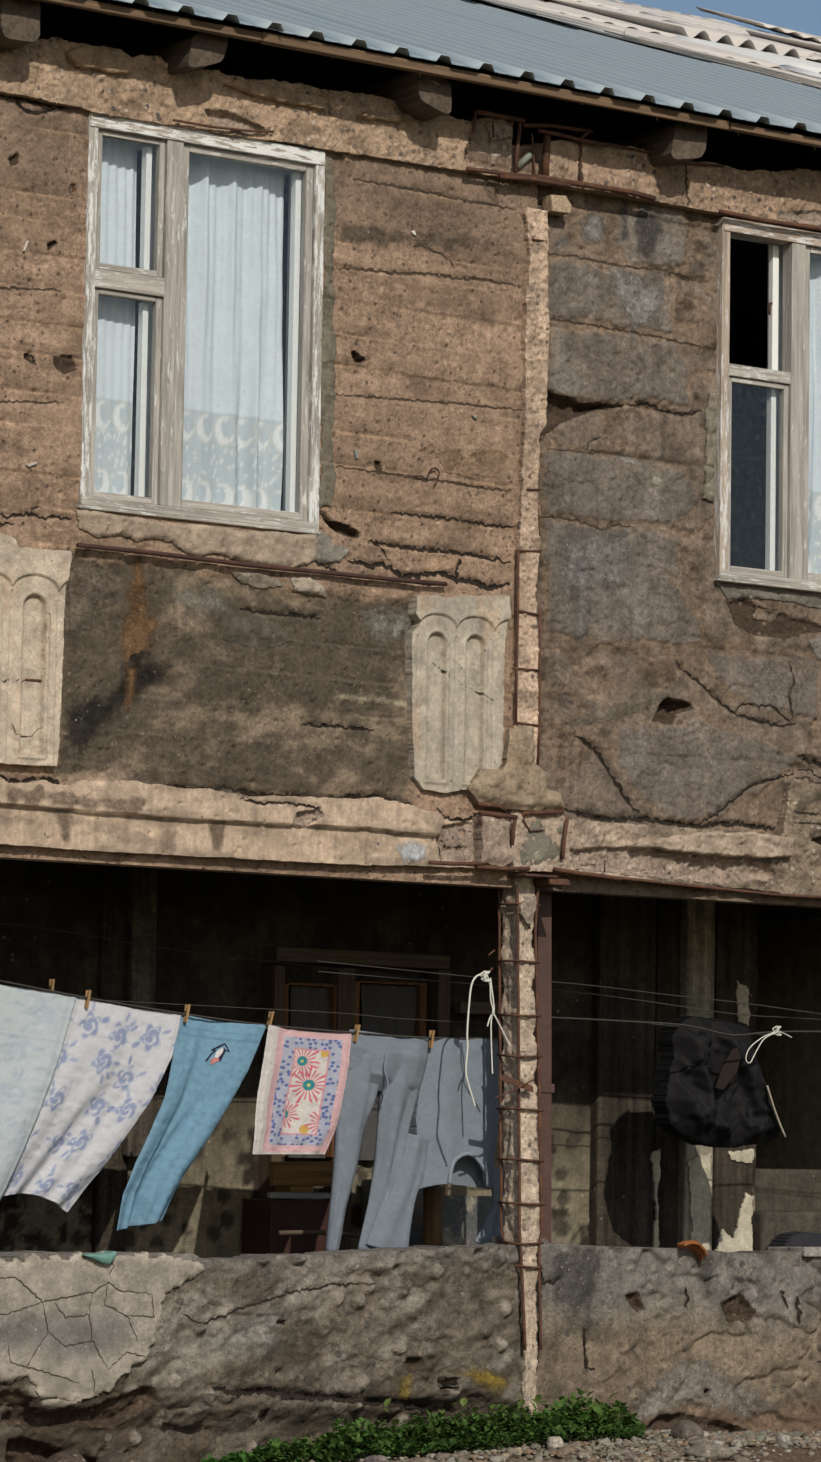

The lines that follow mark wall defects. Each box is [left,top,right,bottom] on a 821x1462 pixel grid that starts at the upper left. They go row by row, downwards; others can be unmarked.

crack [0,506,72,525]
corrosion [122,548,157,706]
leakage [370,612,411,638]
spalling [715,582,821,639]
leakage [69,664,171,748]
leakage [339,695,407,708]
spalling [652,697,695,724]
crack [564,660,821,831]
spalling [428,809,821,1350]
crack [0,1262,376,1392]
crack [780,1291,803,1324]